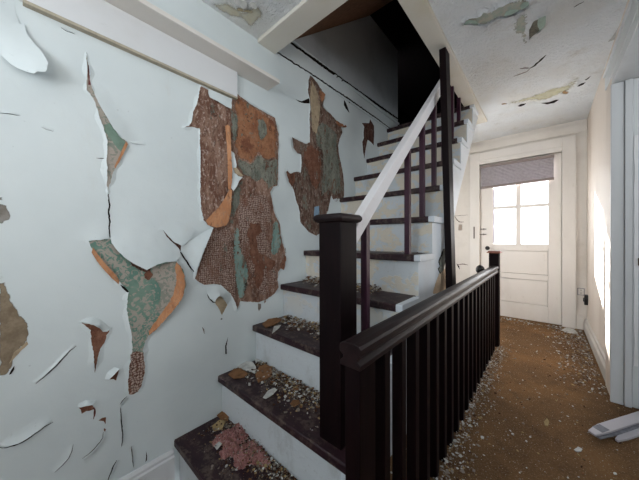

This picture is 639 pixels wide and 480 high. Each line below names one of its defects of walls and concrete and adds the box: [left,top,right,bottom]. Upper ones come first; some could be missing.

peeling [458,0,550,43]
flaking render [362,119,375,160]
flaking render [181,75,347,320]
flaking render [78,317,113,374]
flaking render [105,367,119,380]